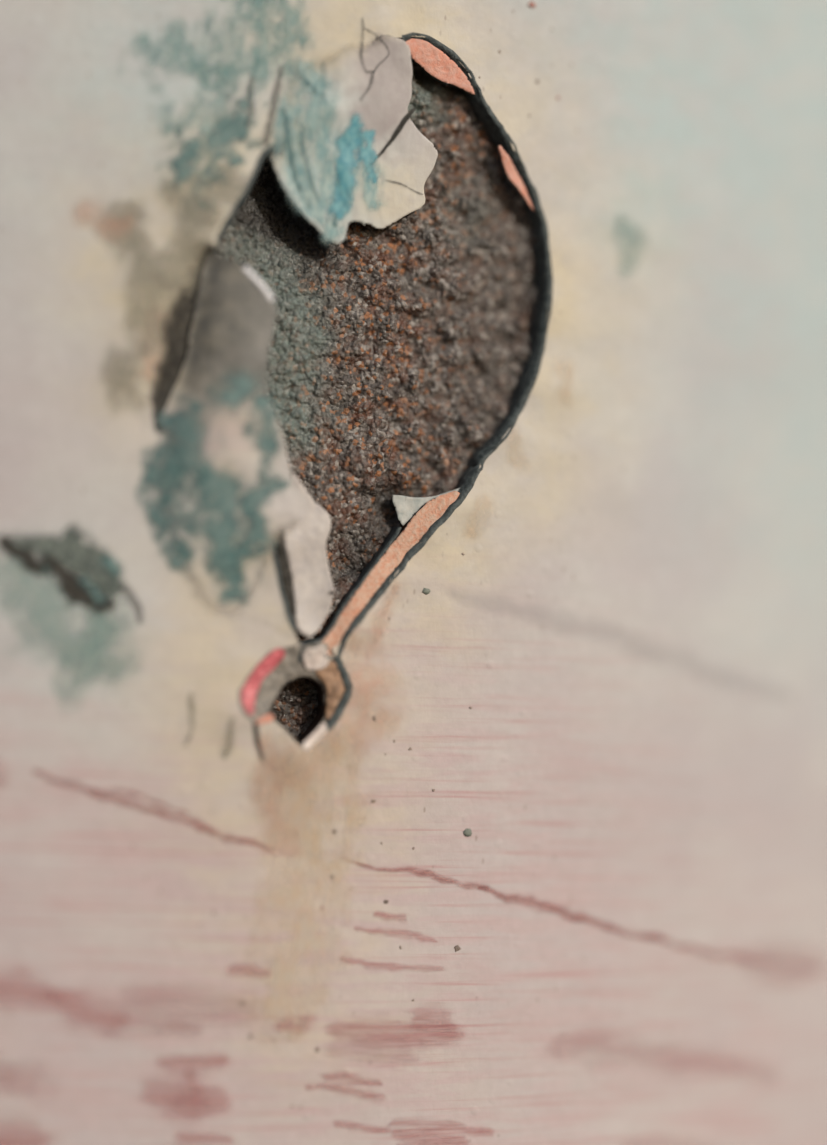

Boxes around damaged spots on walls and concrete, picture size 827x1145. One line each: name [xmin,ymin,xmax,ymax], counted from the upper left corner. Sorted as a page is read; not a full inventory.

damp [132,0,306,345]
damp [276,62,379,241]
damp [139,373,288,601]
peeling [214,32,553,751]